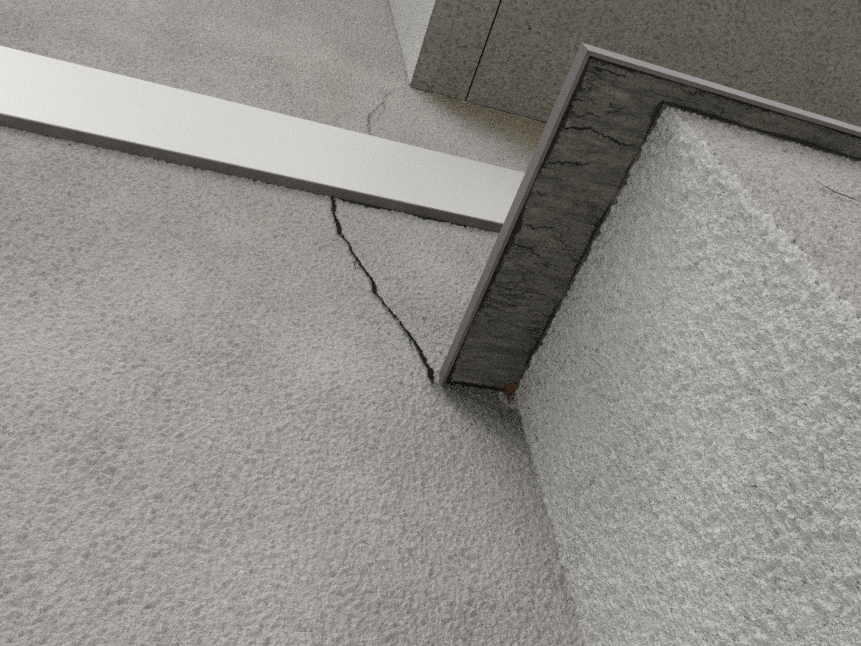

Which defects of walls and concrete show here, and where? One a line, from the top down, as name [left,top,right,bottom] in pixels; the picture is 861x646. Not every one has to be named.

crack [331,195,507,392]